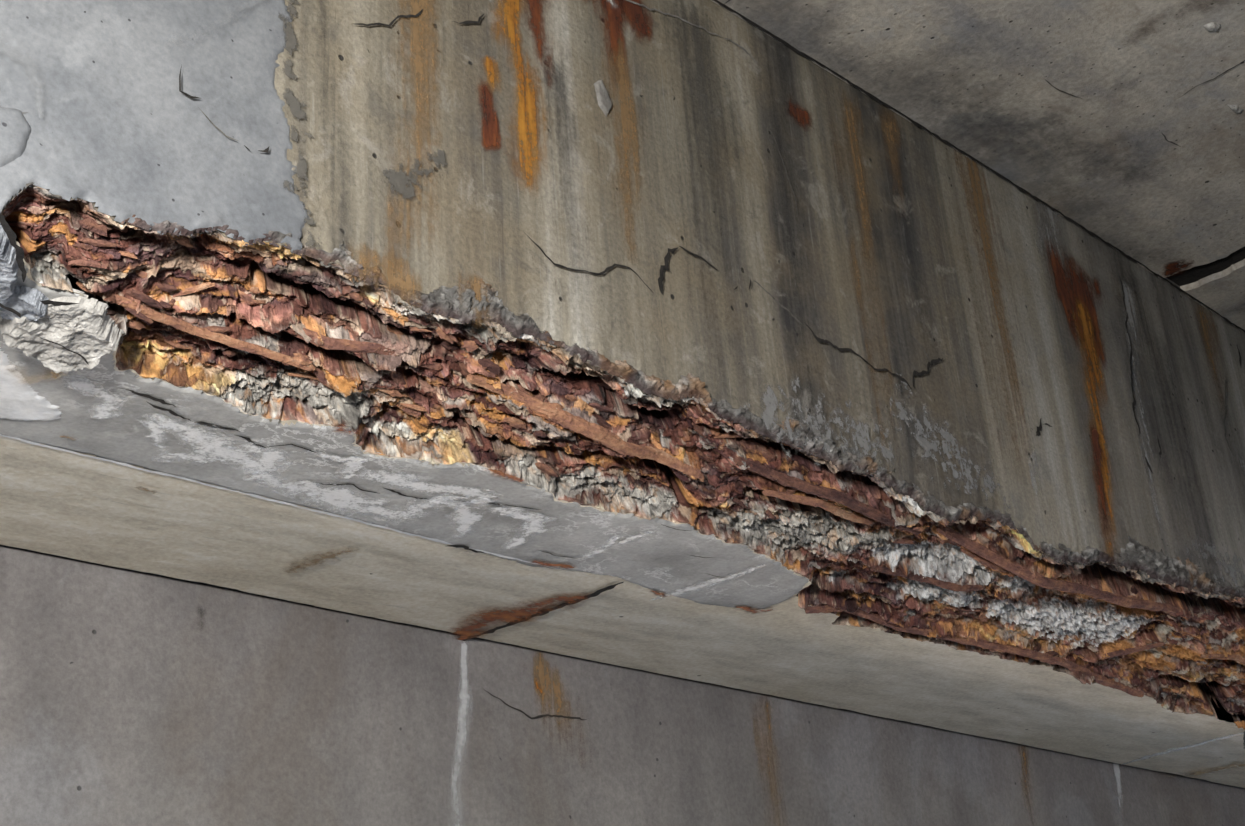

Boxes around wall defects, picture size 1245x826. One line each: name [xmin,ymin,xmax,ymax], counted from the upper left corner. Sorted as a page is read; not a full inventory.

peeling [278,0,314,196]
corrosion [479,56,501,149]
corrosion [497,0,554,186]
spalling [594,79,612,117]
corrosion [600,0,652,251]
water stain [68,380,123,419]
water stain [142,414,549,549]
spalling [0,184,1245,730]
crack [527,235,943,388]
corrosion [1047,244,1115,552]
water stain [652,566,760,600]
water stain [452,642,470,826]